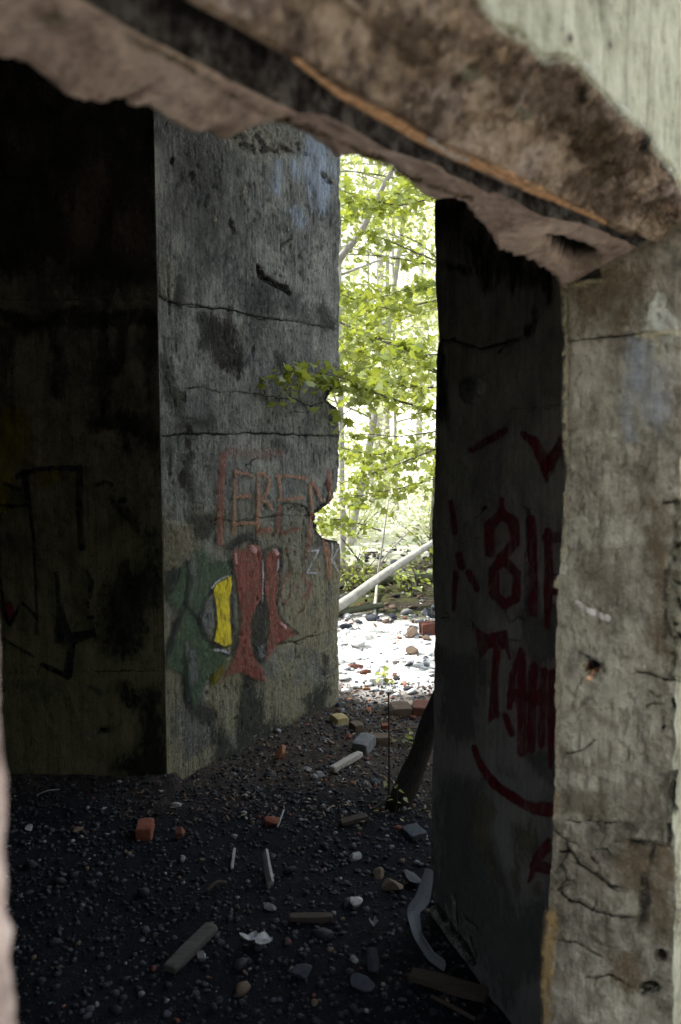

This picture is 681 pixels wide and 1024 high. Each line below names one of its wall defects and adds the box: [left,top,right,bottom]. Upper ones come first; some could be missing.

spalling [459,0,680,185]
spalling [553,235,602,265]
crack [159,288,335,329]
crack [162,387,337,475]
spalling [281,495,340,545]
crack [555,819,670,918]